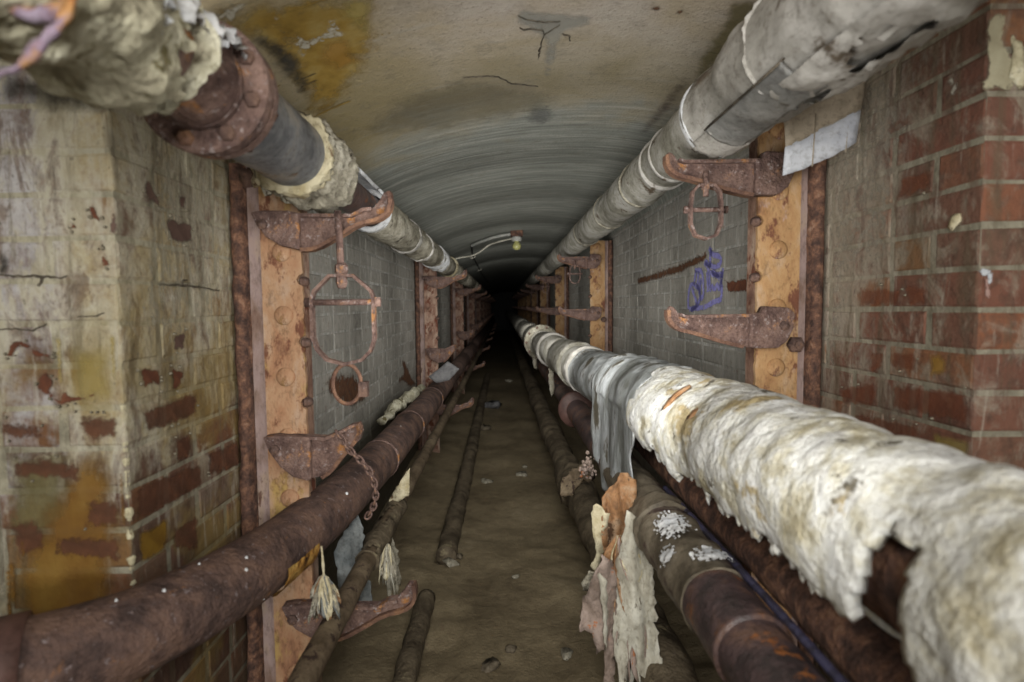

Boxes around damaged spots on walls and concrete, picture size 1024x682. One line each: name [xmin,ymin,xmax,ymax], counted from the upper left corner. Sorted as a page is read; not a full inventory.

damp [218,0,369,117]
crack [464,75,538,87]
crack [518,15,571,59]
peeling [983,14,1024,90]
peeling [142,181,195,247]
peeling [3,339,56,360]
peeling [1,416,44,443]
peeling [34,373,116,440]
peeling [136,328,239,516]
damp [122,441,134,540]
damp [126,555,137,585]
rust [272,544,320,597]